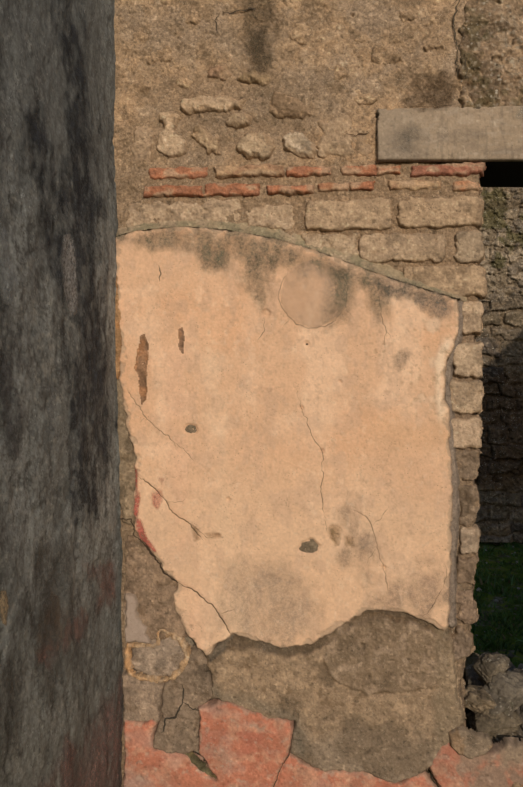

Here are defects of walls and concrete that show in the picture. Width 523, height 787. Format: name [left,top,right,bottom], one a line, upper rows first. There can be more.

crack [452,0,468,76]
water stain [197,232,297,299]
water stain [134,334,149,405]
crack [128,393,194,461]
crack [297,396,327,530]
crack [140,478,207,540]
spalling [115,276,467,783]
crack [121,518,232,634]
crack [161,685,200,733]